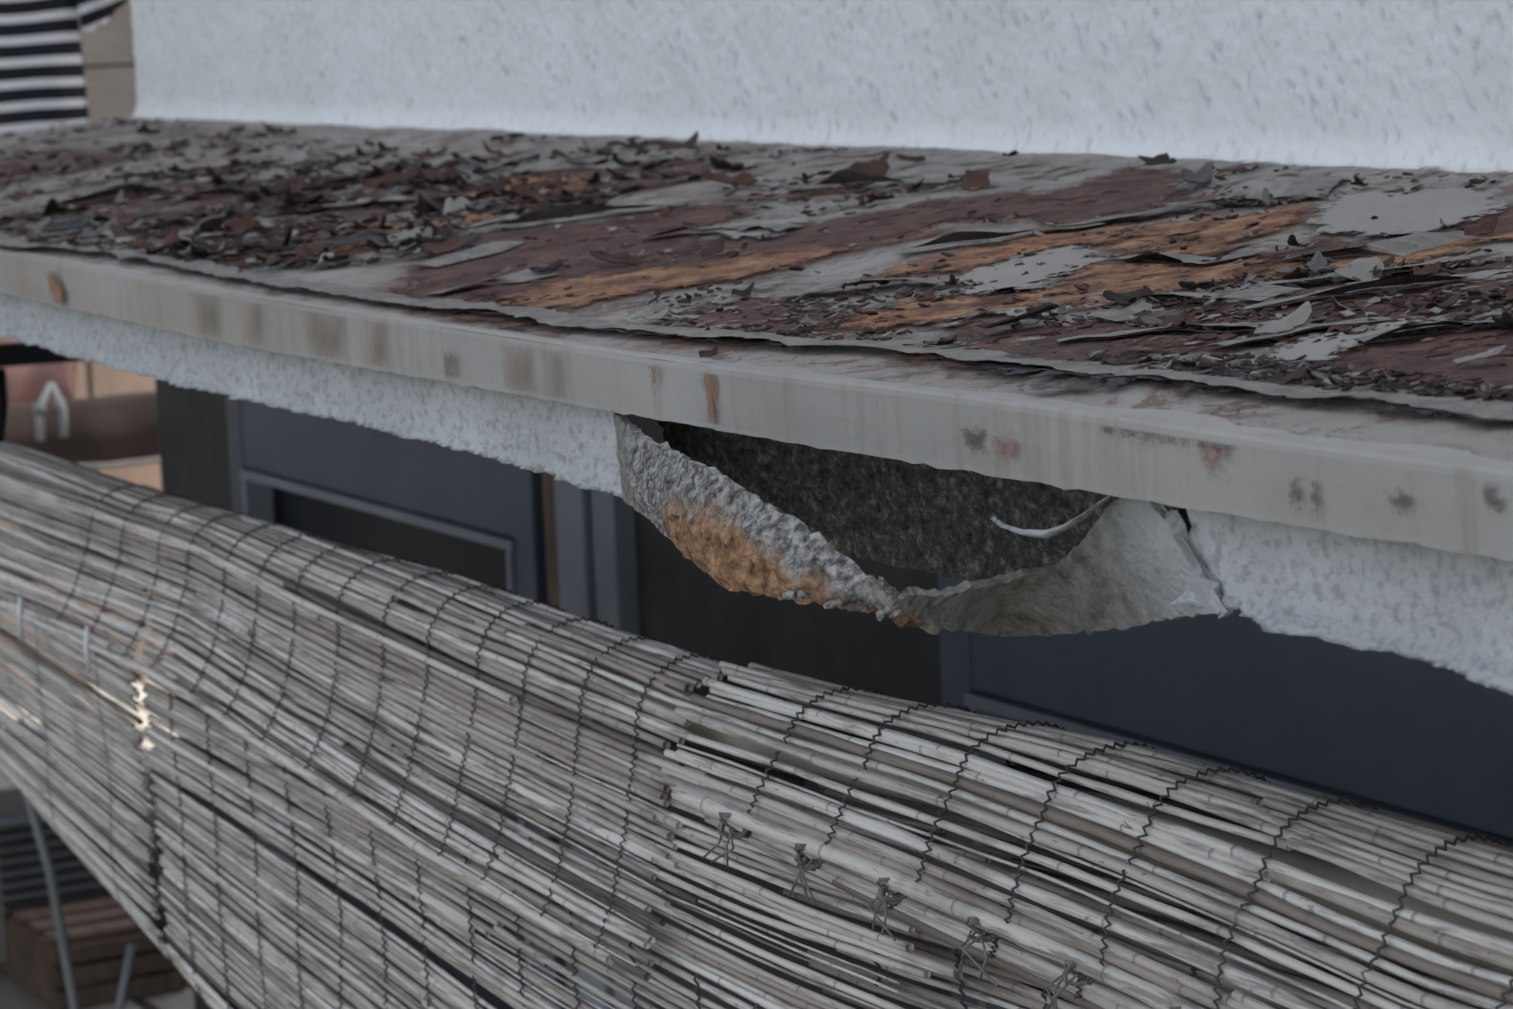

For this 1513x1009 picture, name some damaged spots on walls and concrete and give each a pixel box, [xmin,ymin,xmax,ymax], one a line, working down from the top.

corrosion [701,373,717,424]
peeling [0,117,1513,402]
corrosion [0,155,1513,402]
peeling [613,413,1233,637]